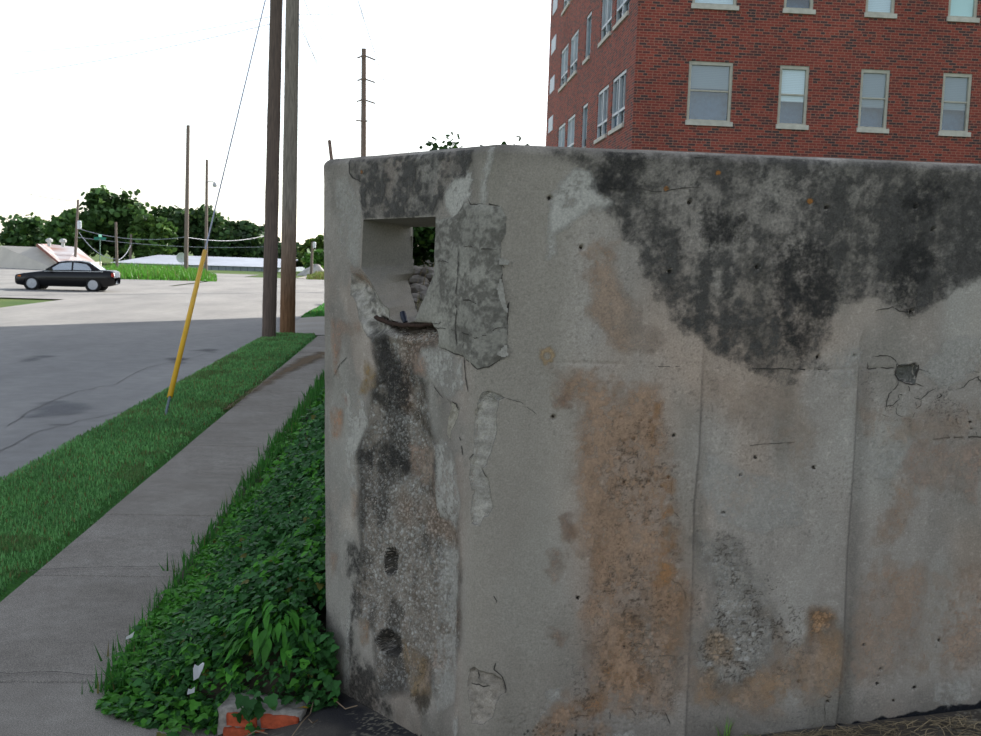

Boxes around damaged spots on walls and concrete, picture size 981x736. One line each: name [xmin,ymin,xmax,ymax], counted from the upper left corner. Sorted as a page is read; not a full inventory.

water stain [337,147,495,263]
water stain [548,152,981,375]
spalling [351,270,460,700]
spalling [469,392,505,526]
crack [867,355,981,440]
spalling [467,667,505,724]